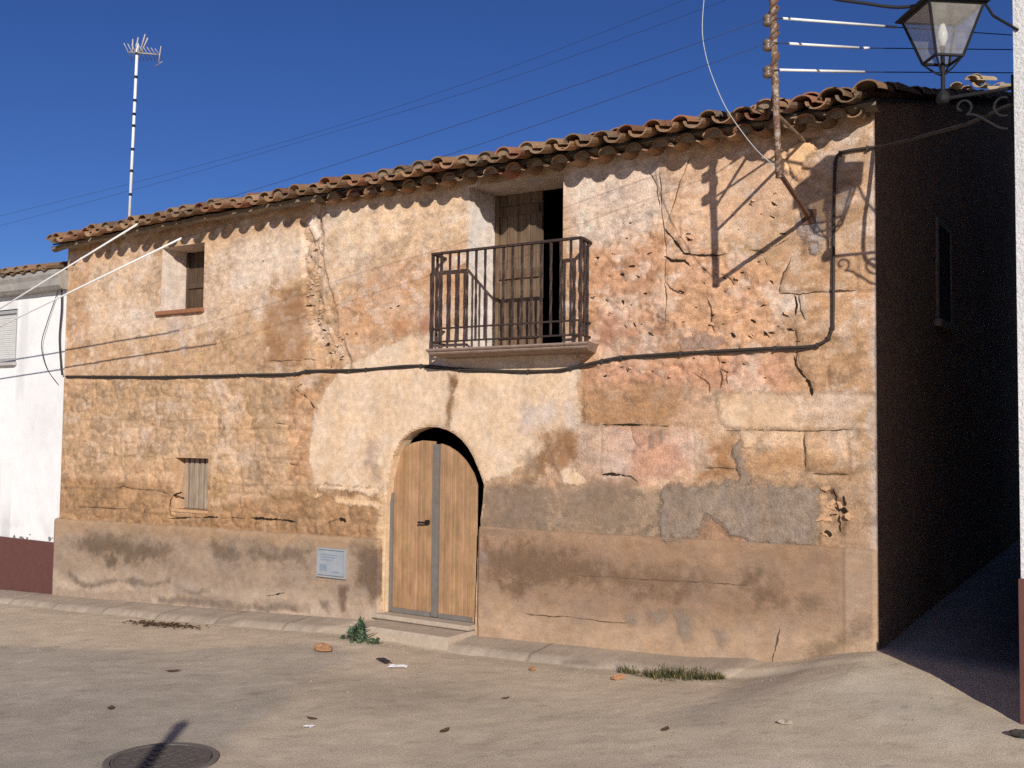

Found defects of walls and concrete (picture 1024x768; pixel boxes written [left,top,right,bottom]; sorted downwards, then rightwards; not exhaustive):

crack [650,159,735,323]
crack [753,237,856,396]
crack [693,358,728,394]
damp [521,399,577,473]
crack [602,472,638,482]
crack [82,485,296,522]
spalling [816,486,855,537]
damp [80,536,164,566]
damp [359,549,383,597]
crack [525,613,623,623]